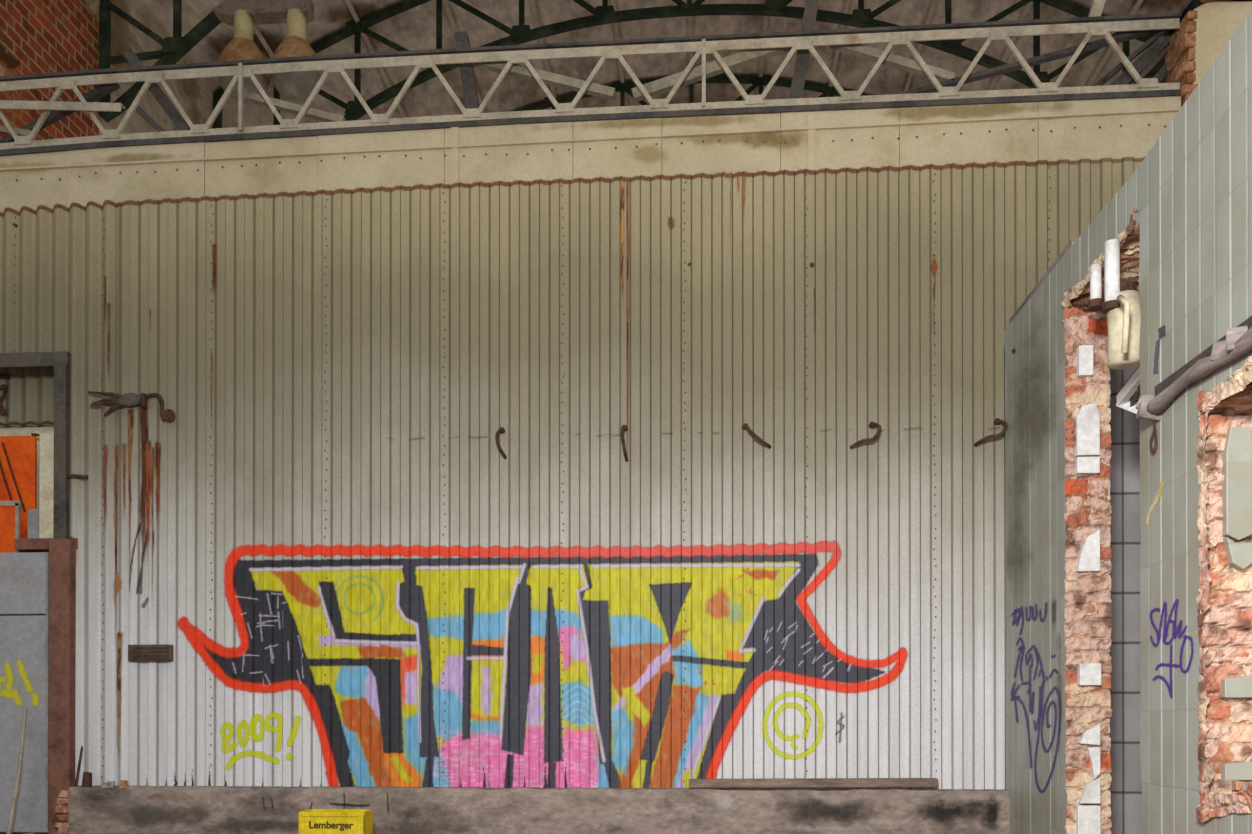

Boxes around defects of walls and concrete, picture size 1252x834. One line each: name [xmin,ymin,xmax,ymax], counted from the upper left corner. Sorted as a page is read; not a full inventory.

rust [0,160,1074,421]
spalling [1115,207,1140,291]
rust [103,407,161,599]
spalling [1061,251,1113,834]
spalling [1196,356,1252,824]
damp [797,801,870,831]
damp [923,802,998,827]